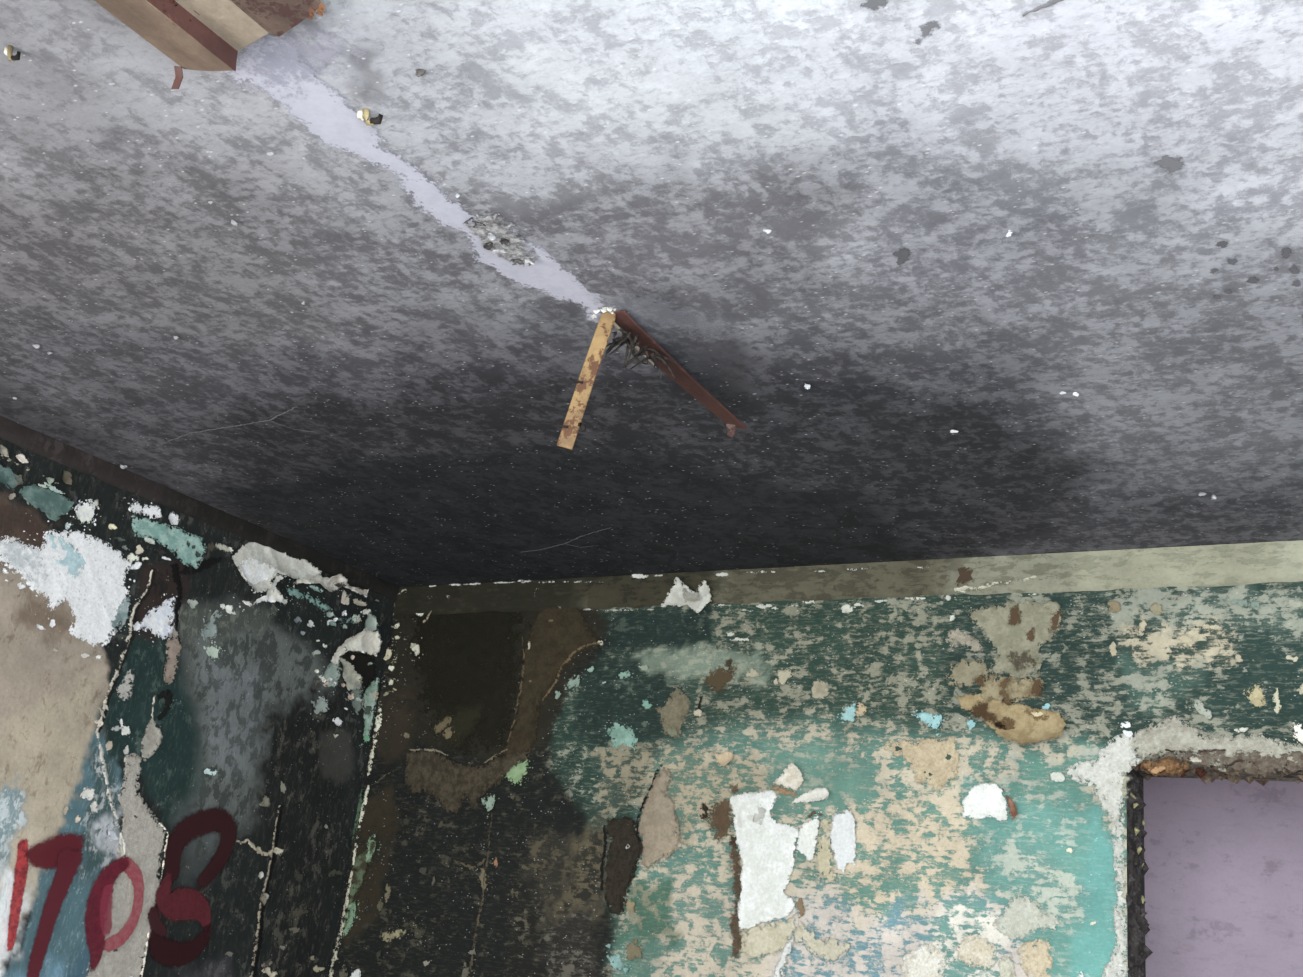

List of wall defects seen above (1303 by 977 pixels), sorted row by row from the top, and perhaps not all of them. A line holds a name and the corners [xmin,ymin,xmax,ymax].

spalling [463,211,540,267]
peeling [841,600,887,613]
flaking render [943,591,983,653]
peeling [0,445,729,977]
water stain [432,705,481,745]
peeling [837,703,867,726]
flaking render [884,710,977,790]
flaking render [1243,684,1282,713]
peeling [962,783,1018,821]
spalling [1050,699,1303,977]
peeling [729,763,862,977]
flaking render [900,892,1062,977]